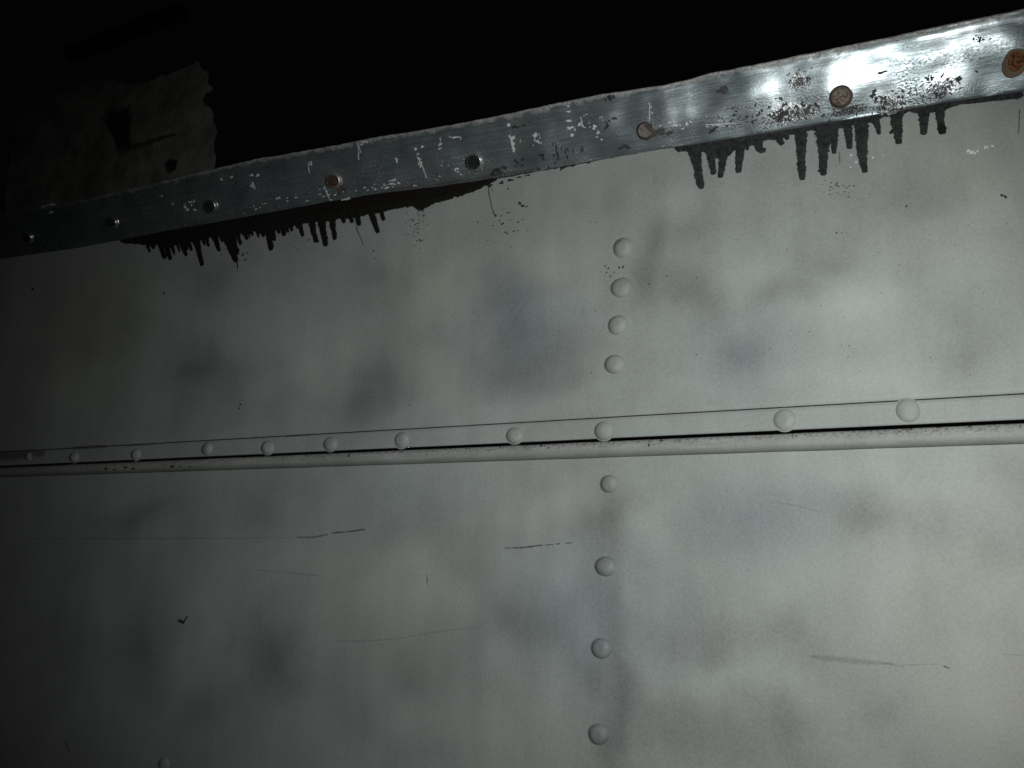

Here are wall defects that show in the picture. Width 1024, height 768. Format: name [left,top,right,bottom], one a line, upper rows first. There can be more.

water stain [686,111,904,189]
water stain [917,107,947,135]
water stain [143,179,487,267]